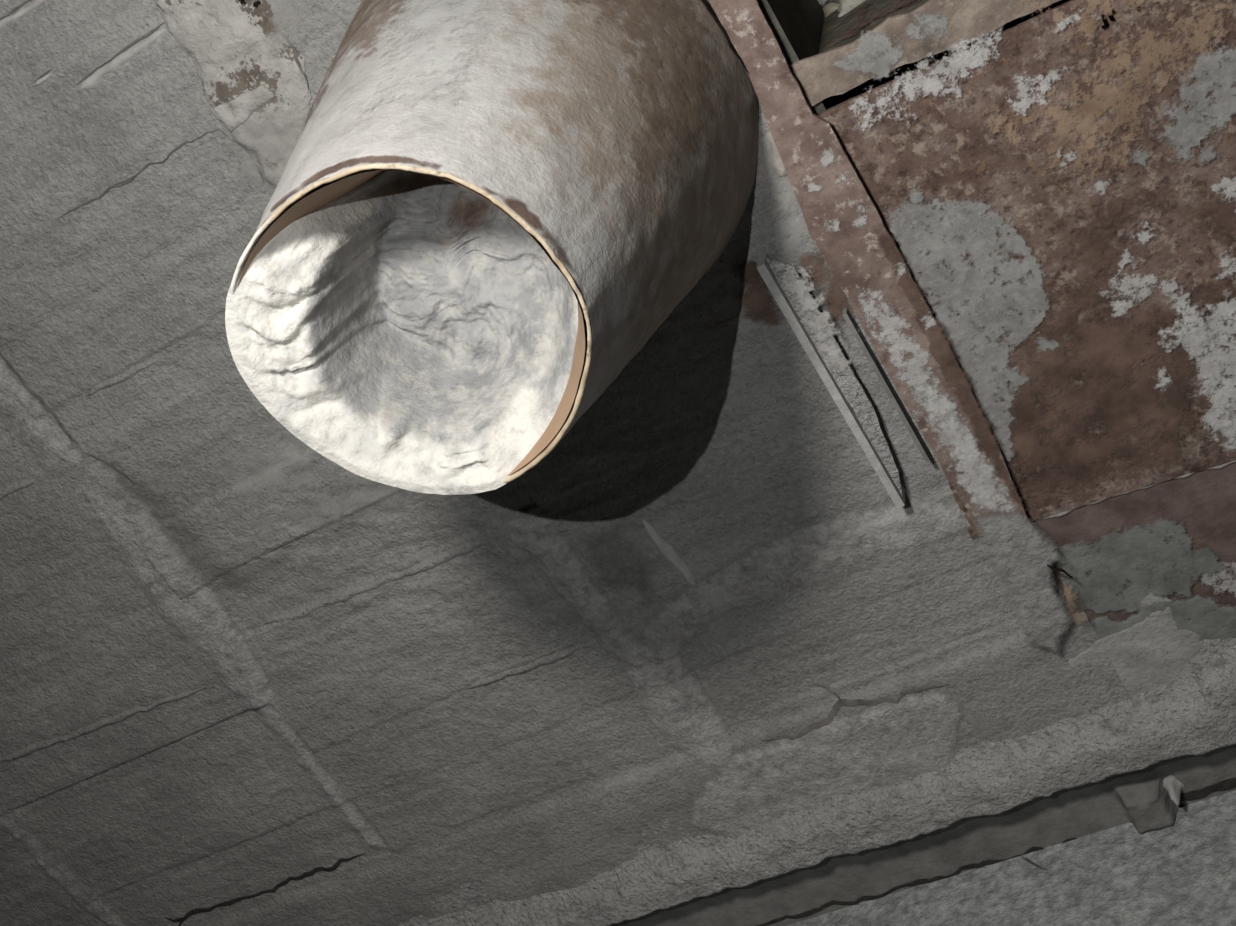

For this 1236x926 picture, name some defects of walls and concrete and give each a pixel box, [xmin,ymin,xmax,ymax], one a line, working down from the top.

efflorescence [1055,10,1100,33]
flaking render [154,0,311,188]
corrosion [879,0,1236,512]
crack [761,683,950,741]
crack [165,854,364,926]